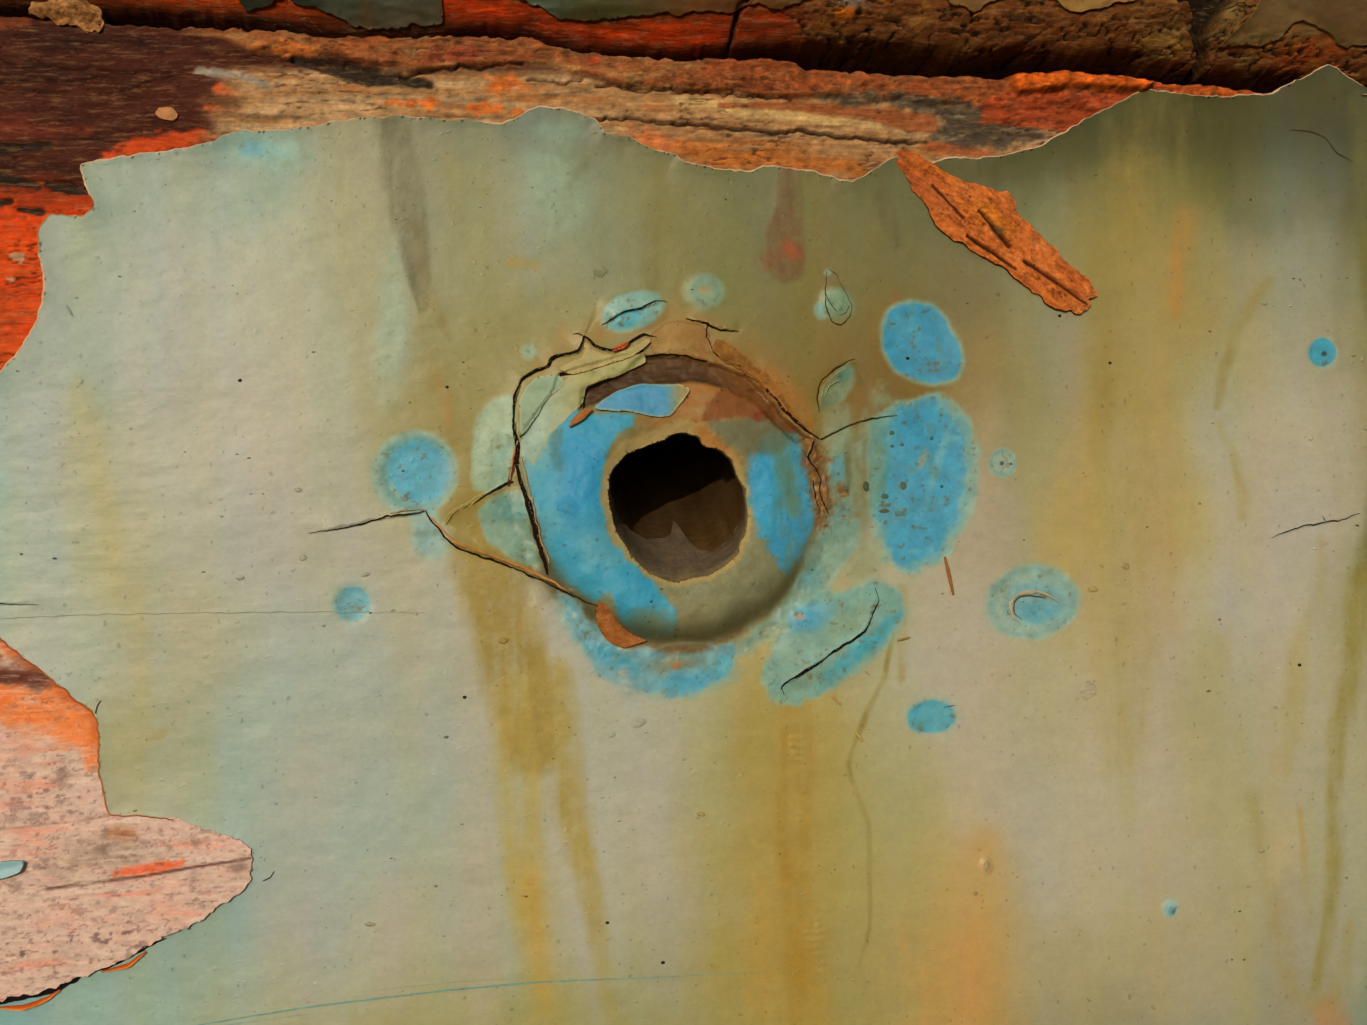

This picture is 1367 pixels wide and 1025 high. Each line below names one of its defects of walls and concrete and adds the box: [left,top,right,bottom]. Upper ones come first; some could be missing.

peeling [366,225,417,445]
peeling [0,16,1367,373]
crack [825,268,852,325]
peeling [0,638,253,1011]
rust [440,475,622,989]
peeling [466,339,689,571]
crack [311,300,897,607]
rust [595,601,646,648]
peeling [551,385,907,705]
crack [781,588,879,695]
crack [1272,513,1360,538]